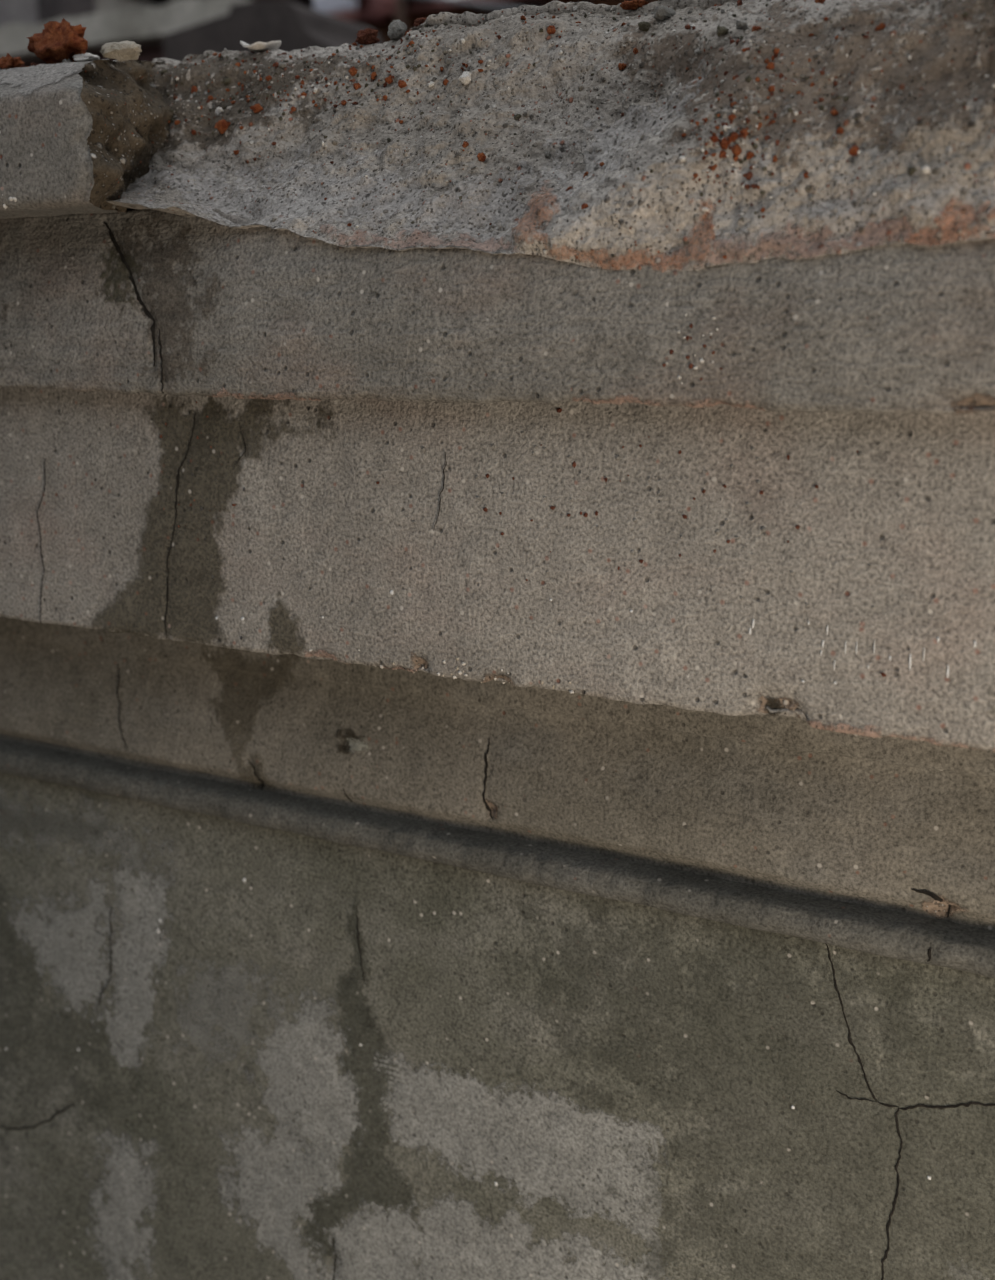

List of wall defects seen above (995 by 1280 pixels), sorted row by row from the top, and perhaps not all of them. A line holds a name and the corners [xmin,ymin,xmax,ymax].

spalling [78,0,995,273]
crack [103,222,164,393]
crack [164,413,196,638]
leakage [92,396,305,789]
crack [0,1104,74,1130]
leakage [0,788,669,1280]
crack [826,944,995,1280]